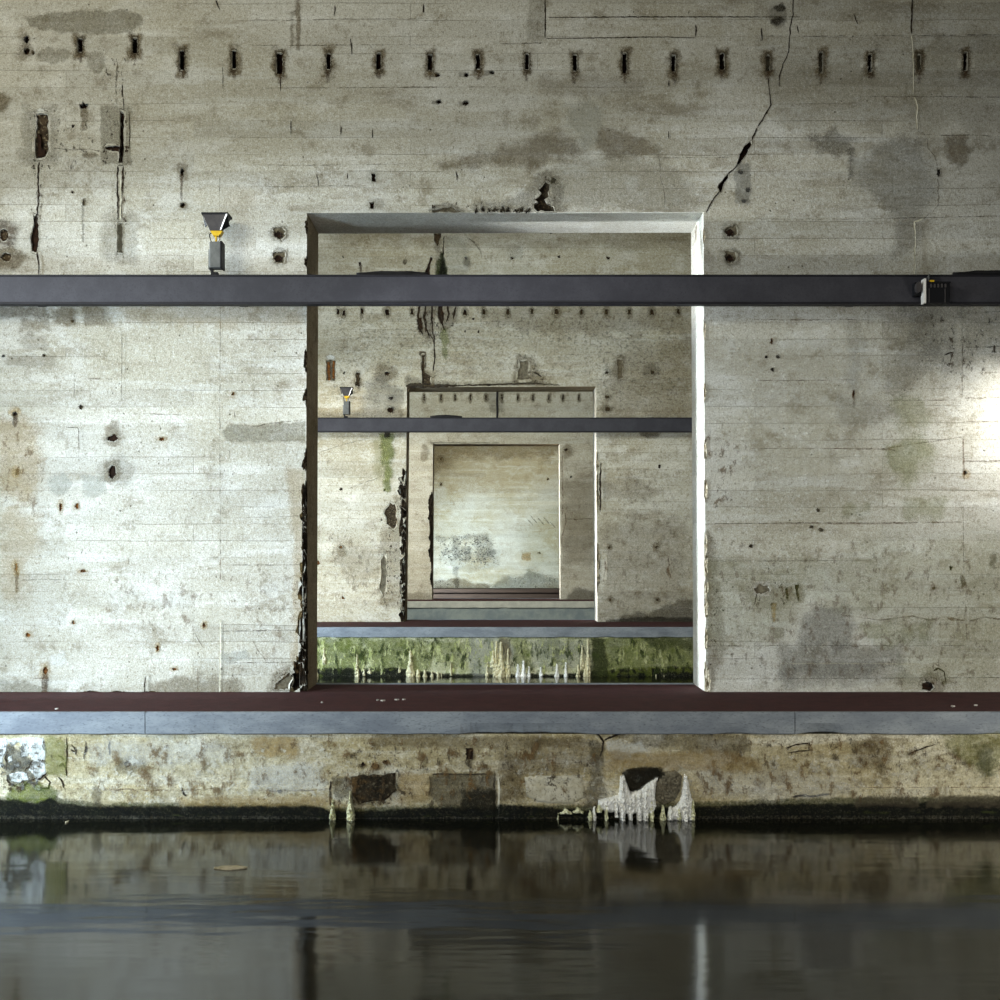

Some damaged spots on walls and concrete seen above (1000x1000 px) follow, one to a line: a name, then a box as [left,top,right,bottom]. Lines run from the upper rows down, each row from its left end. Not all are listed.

crack [706,0,858,212]
spalling [429,176,557,213]
leakage [379,433,394,493]
spalling [272,448,309,692]
spalling [379,469,407,622]
spalling [329,760,398,806]
leakage [86,737,834,822]
spalling [429,772,496,811]